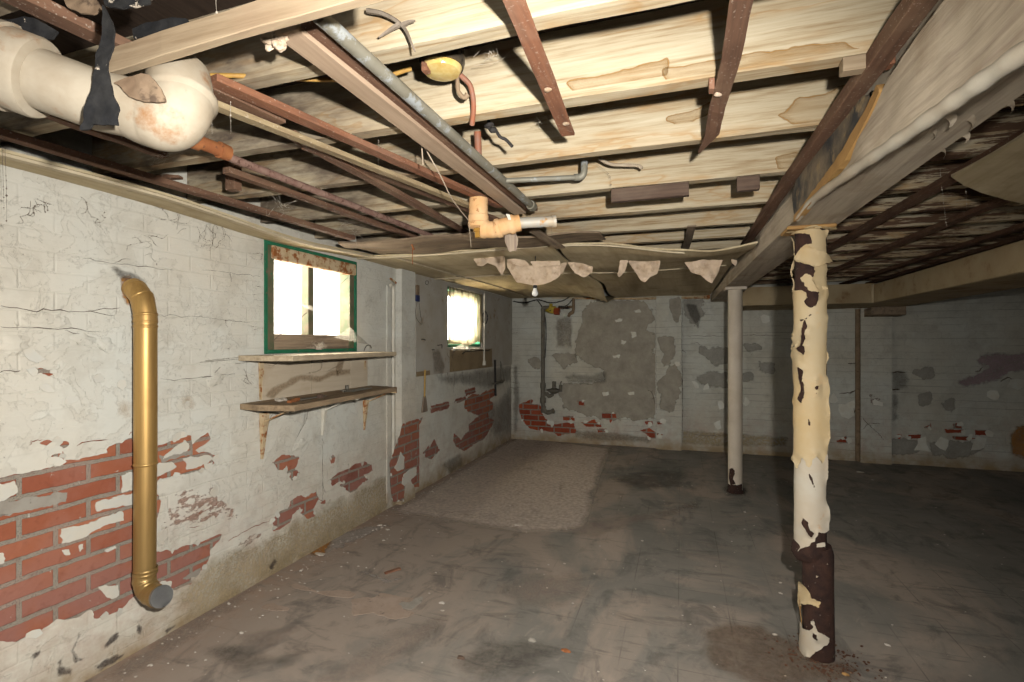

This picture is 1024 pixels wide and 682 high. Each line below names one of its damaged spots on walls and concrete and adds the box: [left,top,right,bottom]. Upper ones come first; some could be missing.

damp [567,58,721,91]
damp [741,42,859,68]
crack [3,306,117,334]
flaking render [519,297,728,440]
flaking render [389,387,494,502]
flaking render [0,436,135,642]
flaking render [157,432,219,533]
flaking render [157,534,222,590]
damp [97,479,386,674]
flaking render [268,492,329,531]
flaking render [327,455,373,493]
peeling [798,600,830,658]